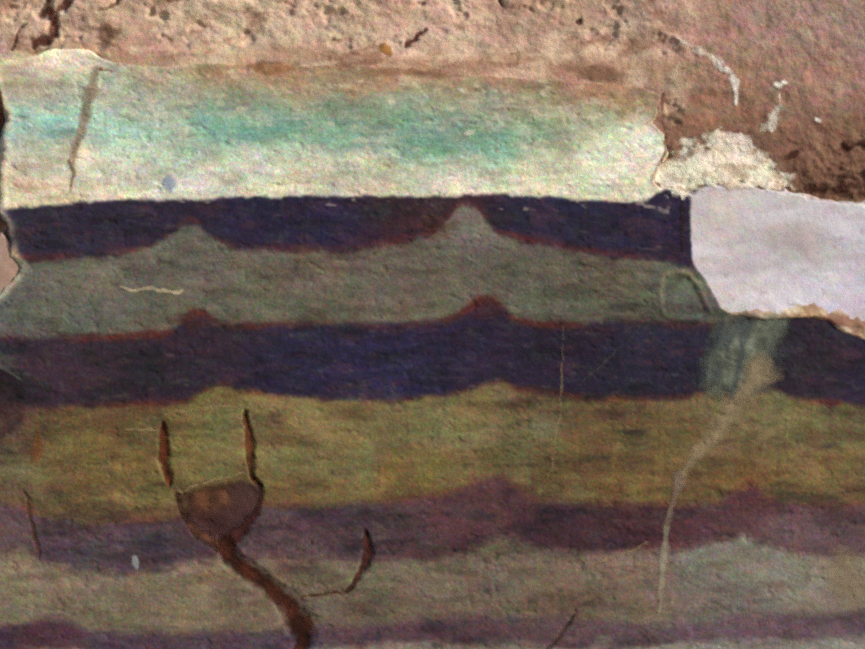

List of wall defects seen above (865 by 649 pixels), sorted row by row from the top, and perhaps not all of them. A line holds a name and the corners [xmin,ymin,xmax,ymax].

crack [11,0,71,51]
crack [0,90,8,136]
crack [68,66,99,189]
spalling [840,139,865,153]
spalling [805,174,849,193]
spalling [721,303,865,340]
leakage [658,316,786,612]